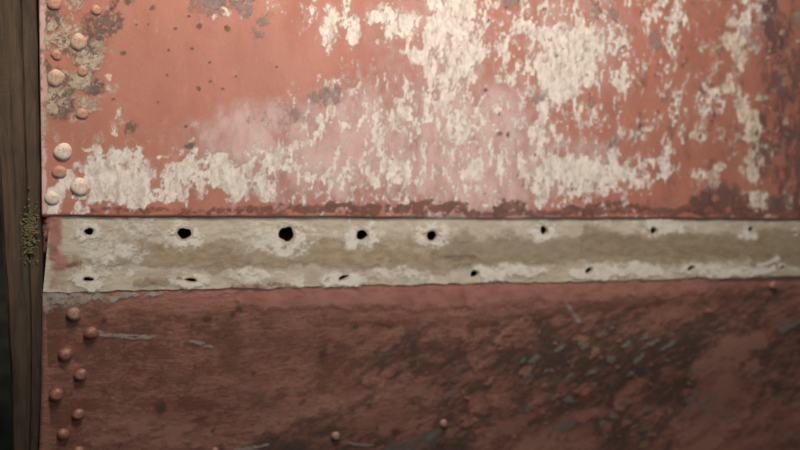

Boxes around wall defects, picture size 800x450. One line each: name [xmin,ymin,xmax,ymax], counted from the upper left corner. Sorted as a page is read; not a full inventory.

damp [411,0,462,75]
rust [41,17,105,139]
peeling [40,0,782,269]
rust [178,199,800,219]
rust [47,308,246,377]